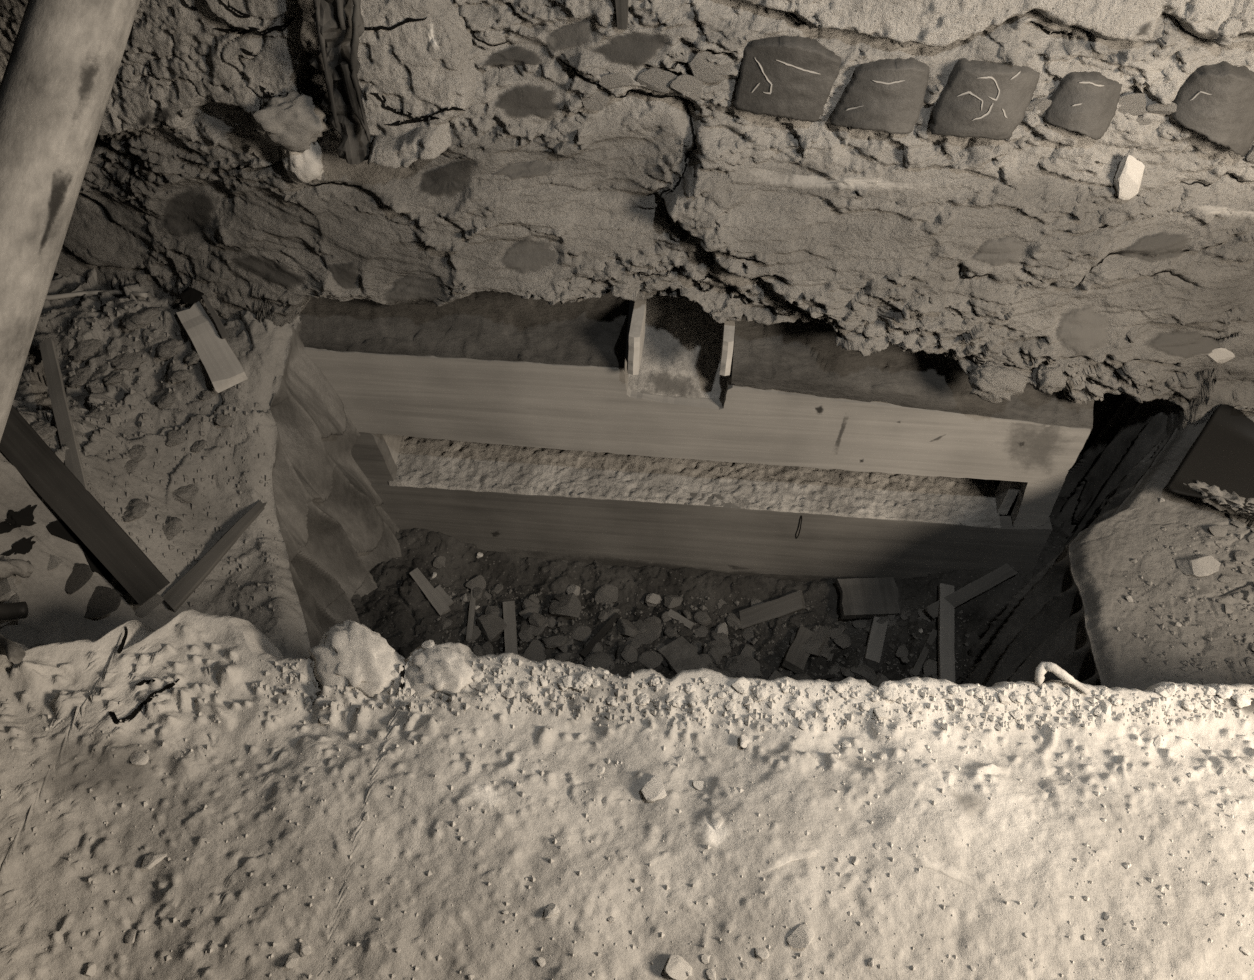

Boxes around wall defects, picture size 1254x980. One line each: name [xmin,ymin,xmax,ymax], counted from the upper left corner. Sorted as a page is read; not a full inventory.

crack [788,12,833,29]
crack [1030,18,1108,40]
crack [1175,18,1205,39]
crack [371,92,465,126]
crack [559,44,731,203]
crack [97,137,165,184]
crack [228,160,282,170]
crack [307,182,375,195]
crack [641,252,795,316]